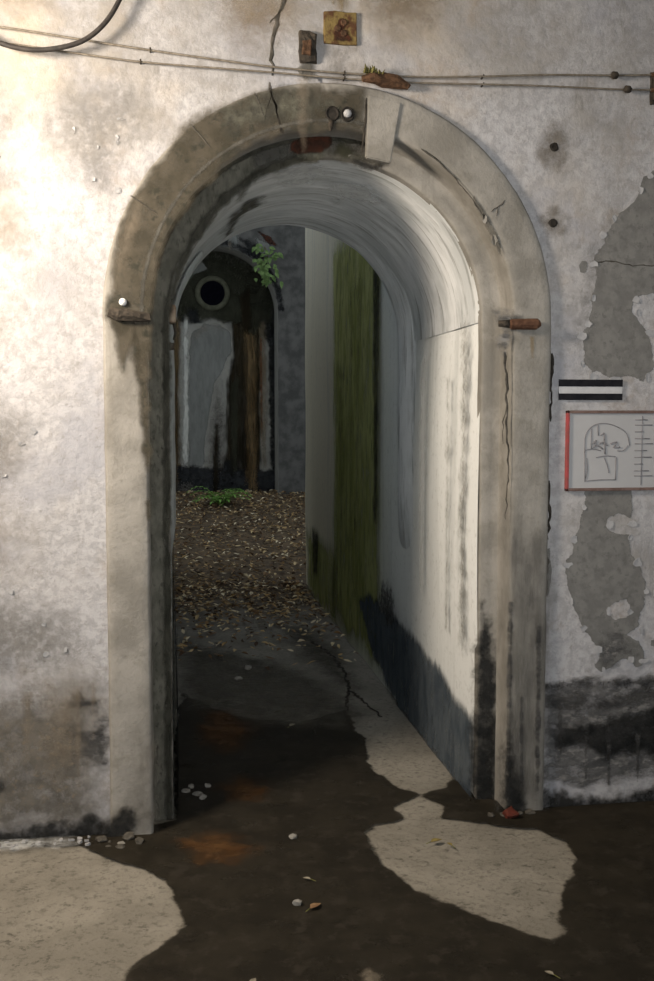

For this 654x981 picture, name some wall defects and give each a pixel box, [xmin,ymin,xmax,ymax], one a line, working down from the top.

crack [265,0,287,153]
spalling [577,171,654,382]
water stain [105,86,385,821]
water stain [0,584,654,981]
crack [311,641,382,717]
spalling [546,490,654,673]